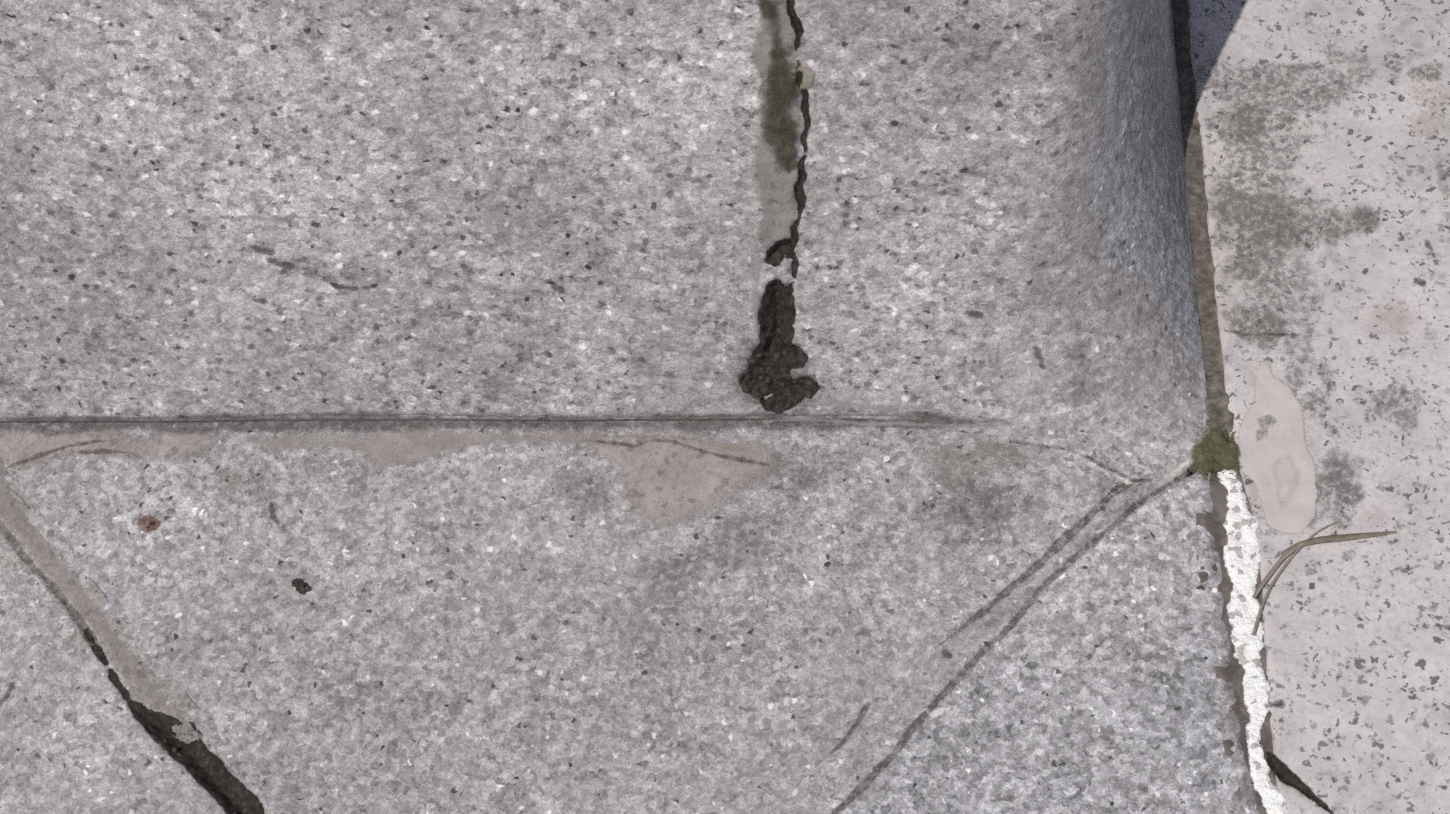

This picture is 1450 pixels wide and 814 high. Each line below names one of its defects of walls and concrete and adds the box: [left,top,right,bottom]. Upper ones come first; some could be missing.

crack [738,0,819,414]
crack [5,531,263,814]
crack [1266,751,1333,814]